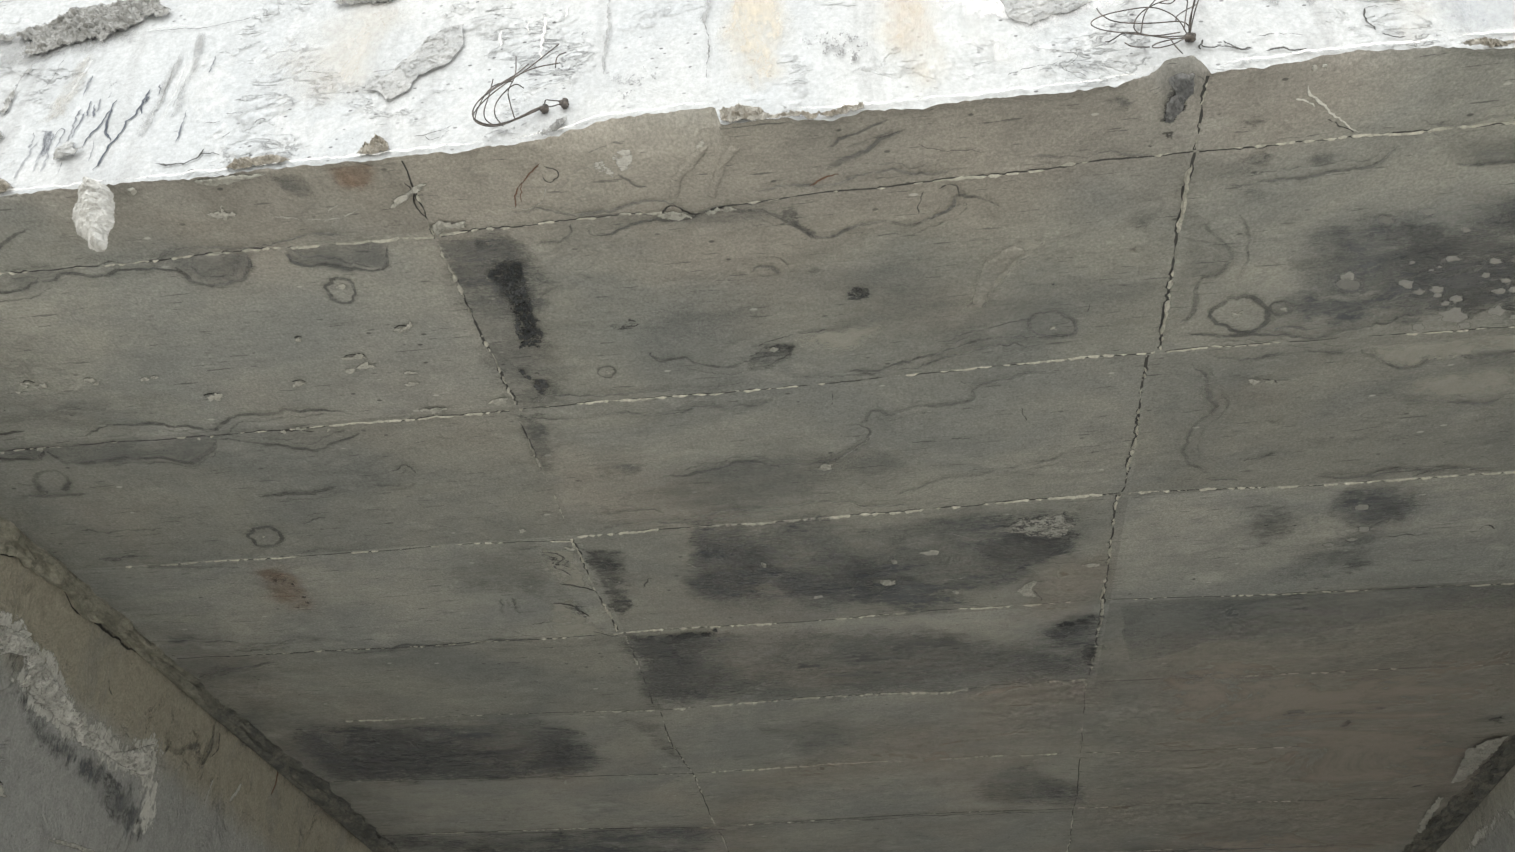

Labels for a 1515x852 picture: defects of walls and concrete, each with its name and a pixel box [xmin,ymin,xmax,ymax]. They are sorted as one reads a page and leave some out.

crack [1198,33,1307,51]
crack [1363,0,1405,38]
crack [84,90,150,169]
crack [155,99,264,173]
crack [791,120,982,235]
damp [444,233,548,349]
damp [1182,200,1515,361]
damp [518,353,738,415]
damp [1376,335,1515,405]
damp [585,550,654,614]
damp [627,508,1077,614]
damp [622,615,1102,706]